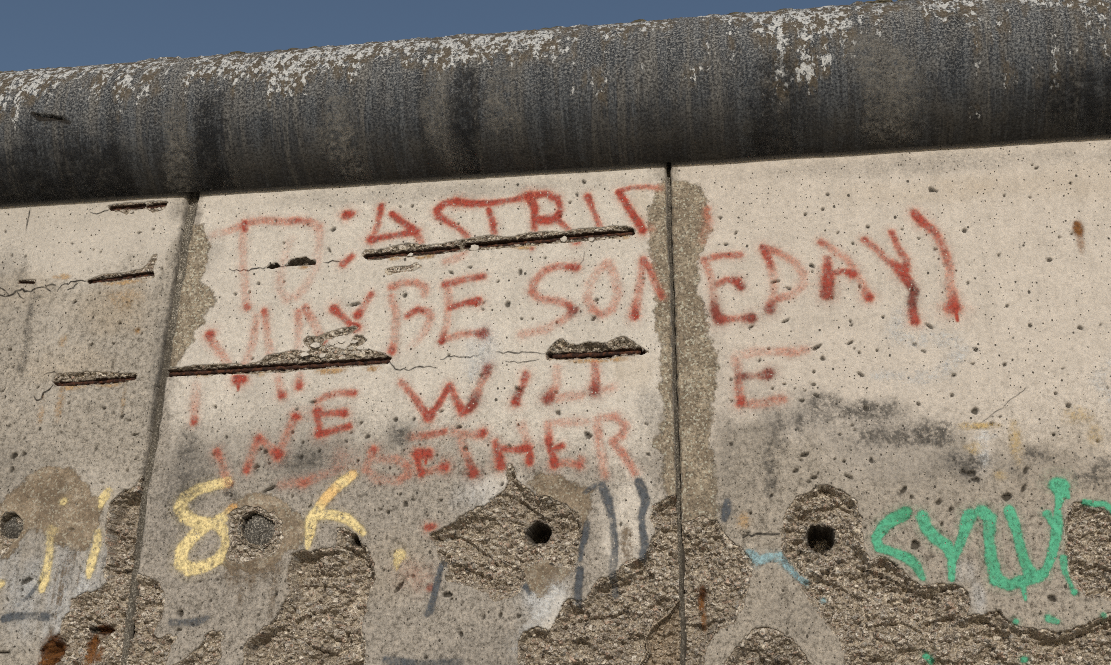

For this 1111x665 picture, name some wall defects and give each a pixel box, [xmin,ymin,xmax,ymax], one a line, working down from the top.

leakage [425,66,516,175]
leakage [845,34,917,140]
crack [1,280,84,299]
corrosion [87,255,157,285]
corrosion [362,226,635,260]
corrosion [167,350,392,378]
corrosion [545,336,649,363]
spalling [517,180,754,665]
spalling [0,466,225,665]
spalling [221,492,376,665]
spalling [430,463,594,602]
spalling [780,485,1111,665]